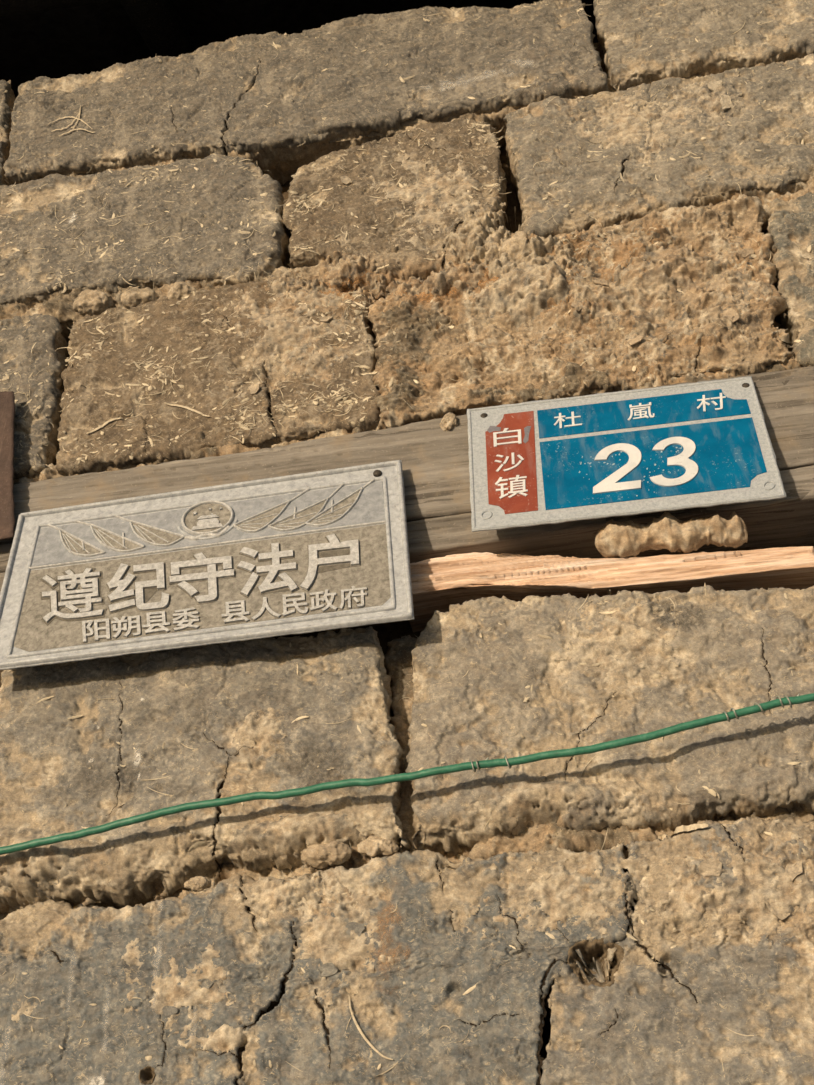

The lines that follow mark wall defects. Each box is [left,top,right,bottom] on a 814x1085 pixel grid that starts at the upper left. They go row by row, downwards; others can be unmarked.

crack [221,60,261,156]
crack [761,628,772,711]
crack [106,682,125,816]
crack [564,692,616,780]
crack [203,733,257,931]
crack [199,921,331,1085]
crack [624,871,698,1003]